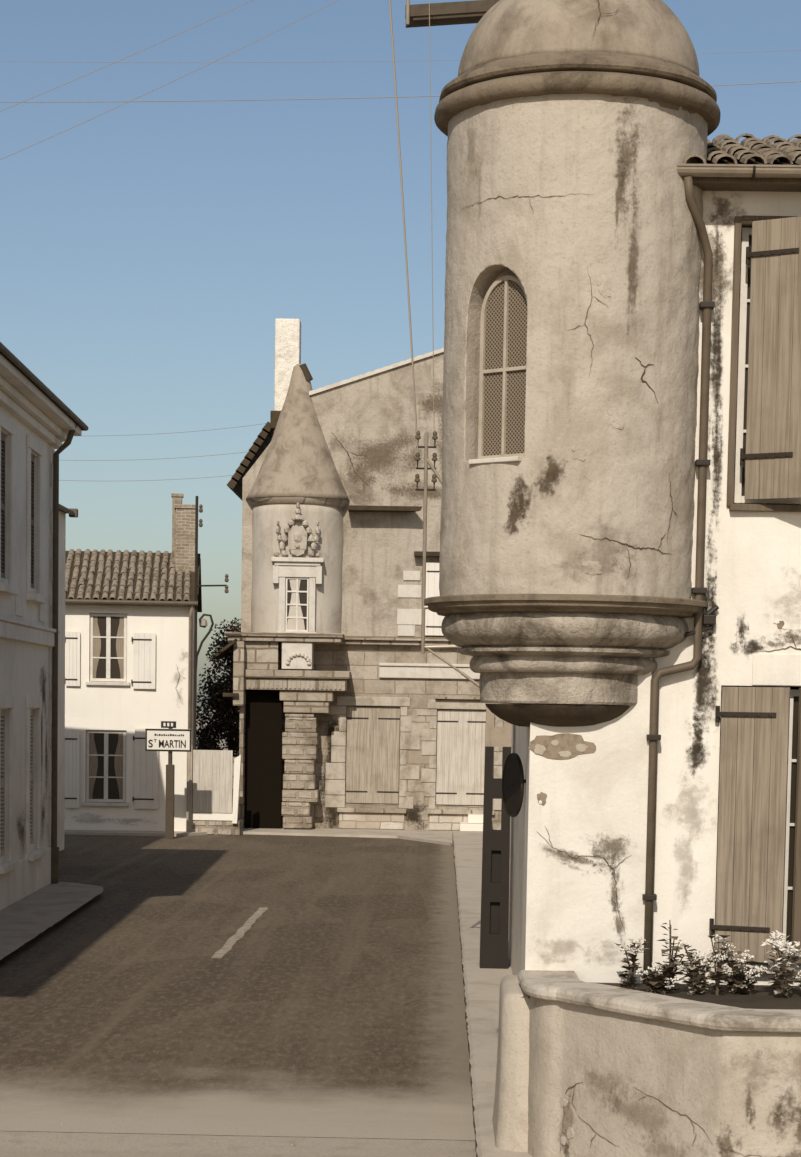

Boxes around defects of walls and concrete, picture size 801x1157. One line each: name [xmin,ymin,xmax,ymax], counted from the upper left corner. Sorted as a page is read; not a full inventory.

crack [467,193,593,210]
crack [570,266,604,375]
crack [635,357,658,402]
damp [507,456,564,533]
crack [580,473,678,579]
damp [686,198,742,774]
spalling [528,733,596,760]
crack [565,1082,619,1147]